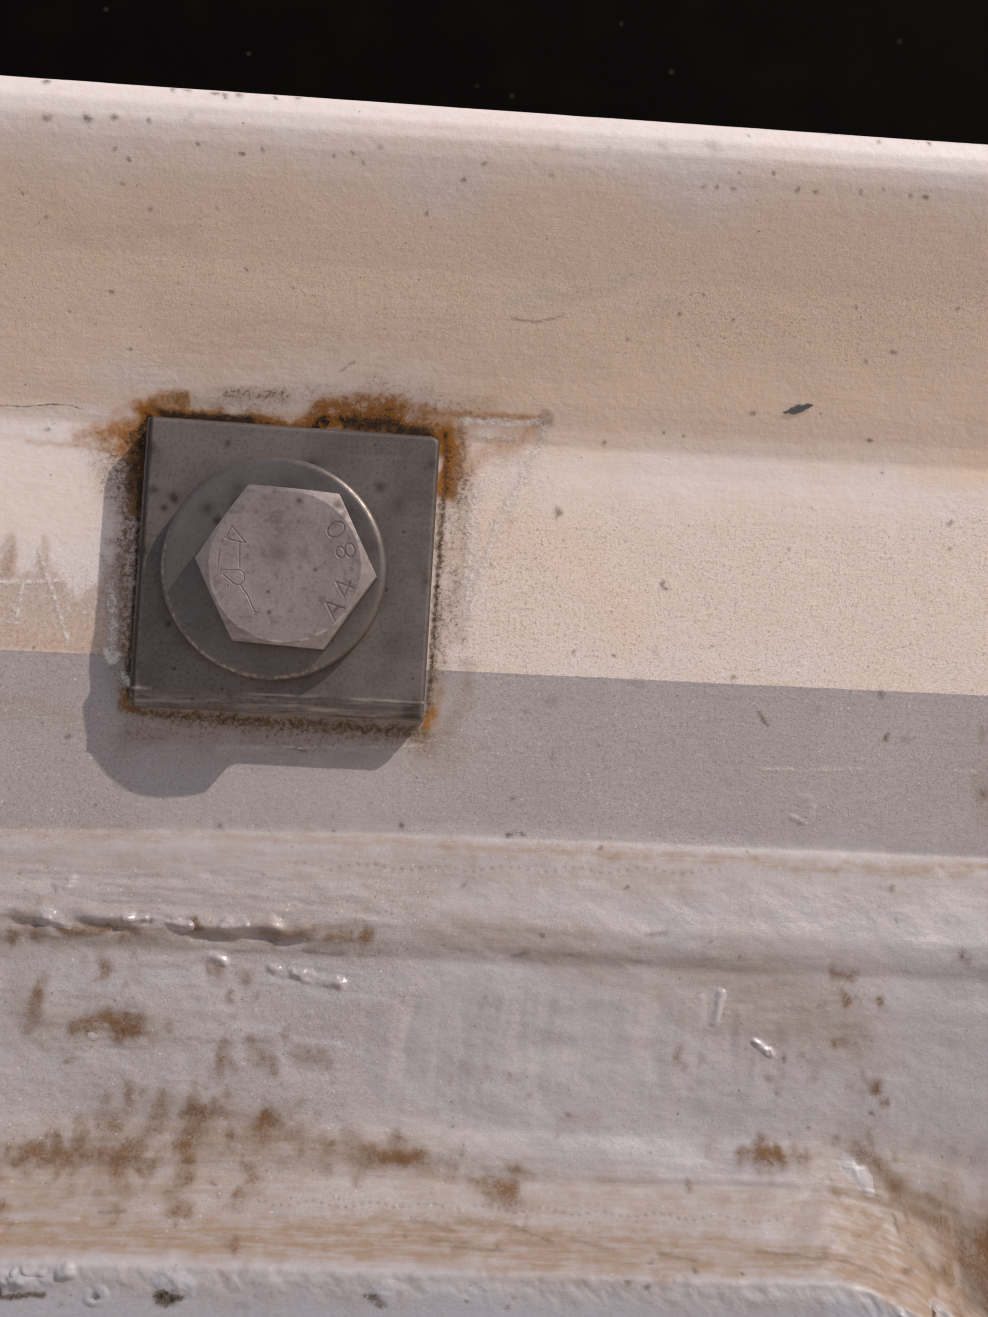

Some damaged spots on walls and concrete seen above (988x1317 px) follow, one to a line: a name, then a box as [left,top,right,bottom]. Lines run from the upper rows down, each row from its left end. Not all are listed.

rust [90,377,534,748]
rust [70,1009,144,1042]
rust [12,1113,160,1192]
rust [176,1103,217,1185]
rust [252,1109,278,1143]
rust [368,1136,425,1167]
rust [471,1165,521,1207]
rust [959,1222,988,1298]